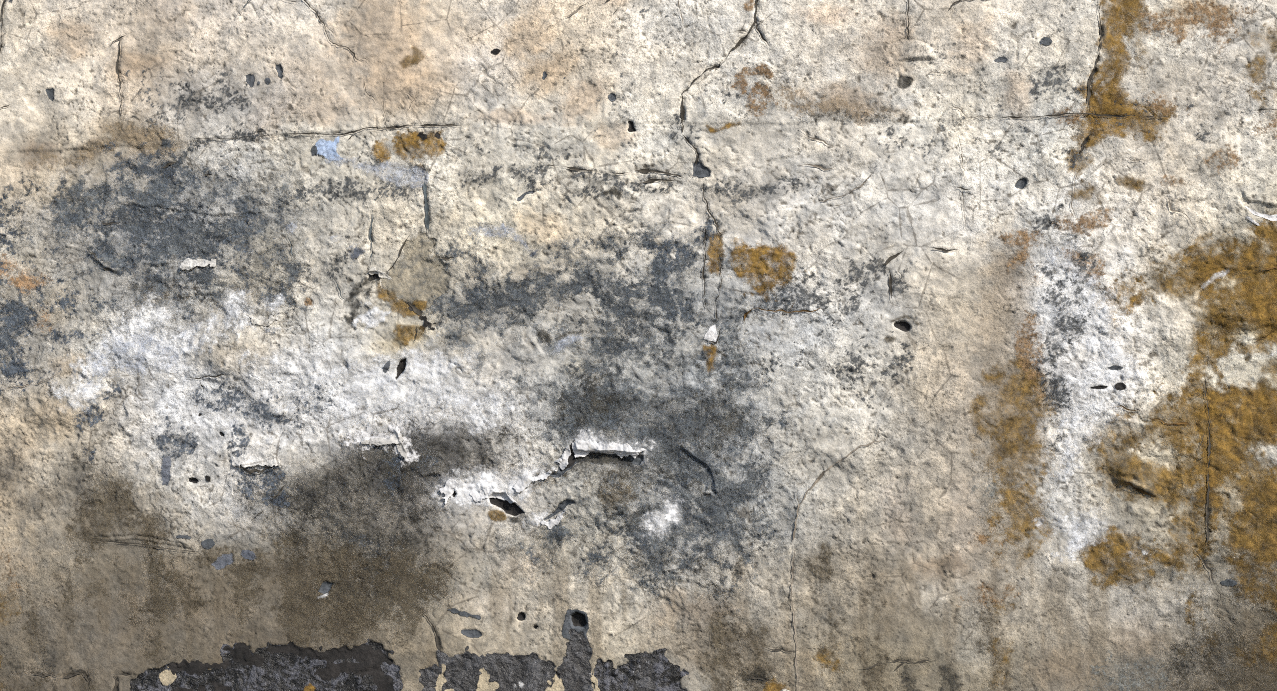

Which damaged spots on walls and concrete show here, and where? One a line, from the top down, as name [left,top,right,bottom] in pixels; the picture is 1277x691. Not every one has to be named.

water stain [0,67,432,432]
crack [162,0,459,176]
water stain [455,138,673,200]
crack [550,0,825,344]
corrosion [707,234,796,297]
water stain [761,252,917,338]
crack [884,0,1166,298]
corrosion [1052,0,1256,199]
water stain [65,173,817,691]
peeling [439,440,646,522]
peeling [540,500,574,529]
corrosion [1062,223,1277,586]